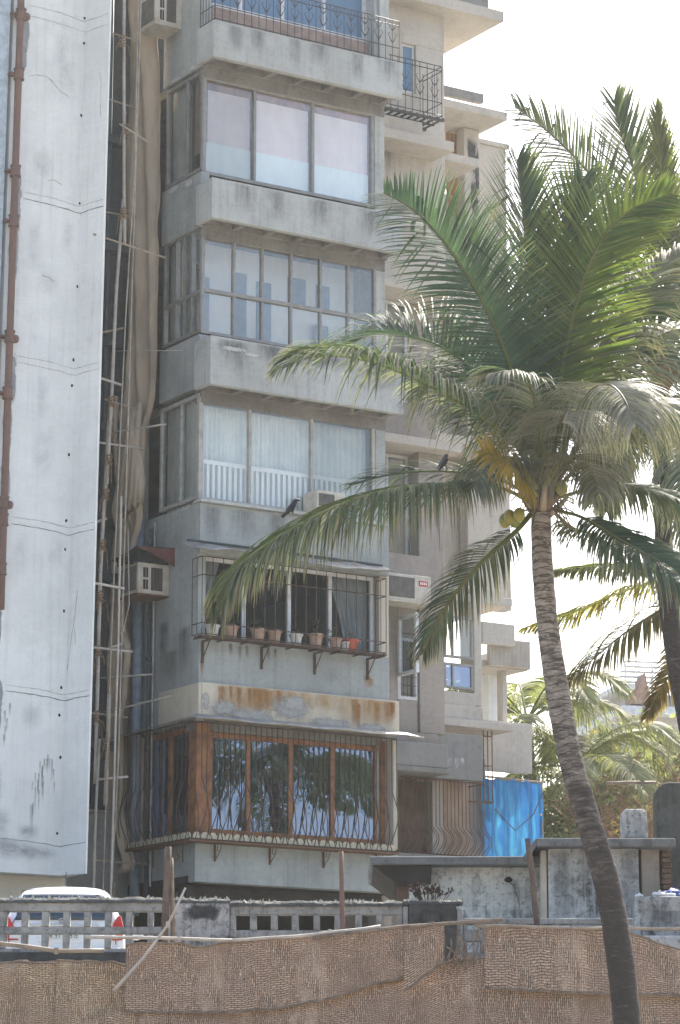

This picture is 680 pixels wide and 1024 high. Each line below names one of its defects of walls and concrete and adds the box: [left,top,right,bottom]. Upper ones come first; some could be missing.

rust [158,682,399,737]